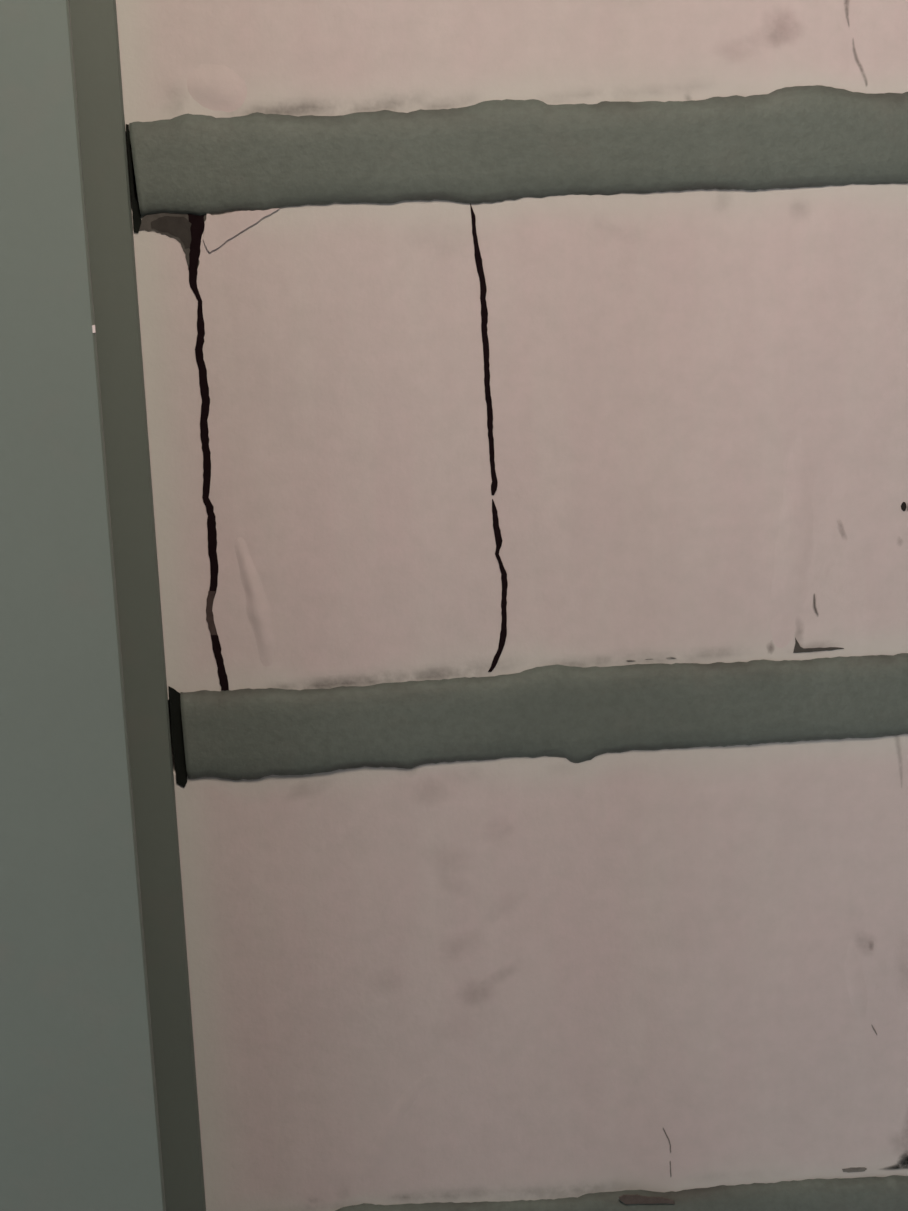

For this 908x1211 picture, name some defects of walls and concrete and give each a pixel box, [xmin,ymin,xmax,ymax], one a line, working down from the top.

crack [188,214,229,691]
crack [470,203,508,672]